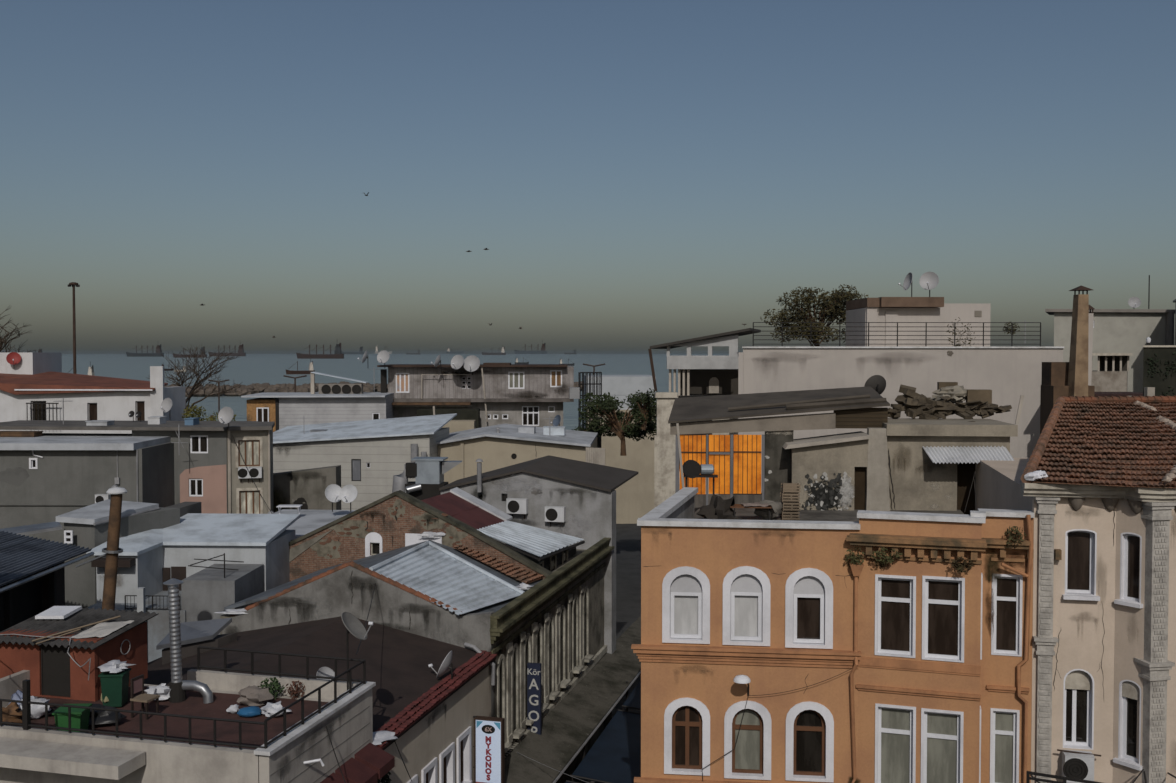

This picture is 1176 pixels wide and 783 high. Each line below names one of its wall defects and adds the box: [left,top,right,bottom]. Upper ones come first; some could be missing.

damp [258,599,312,617]